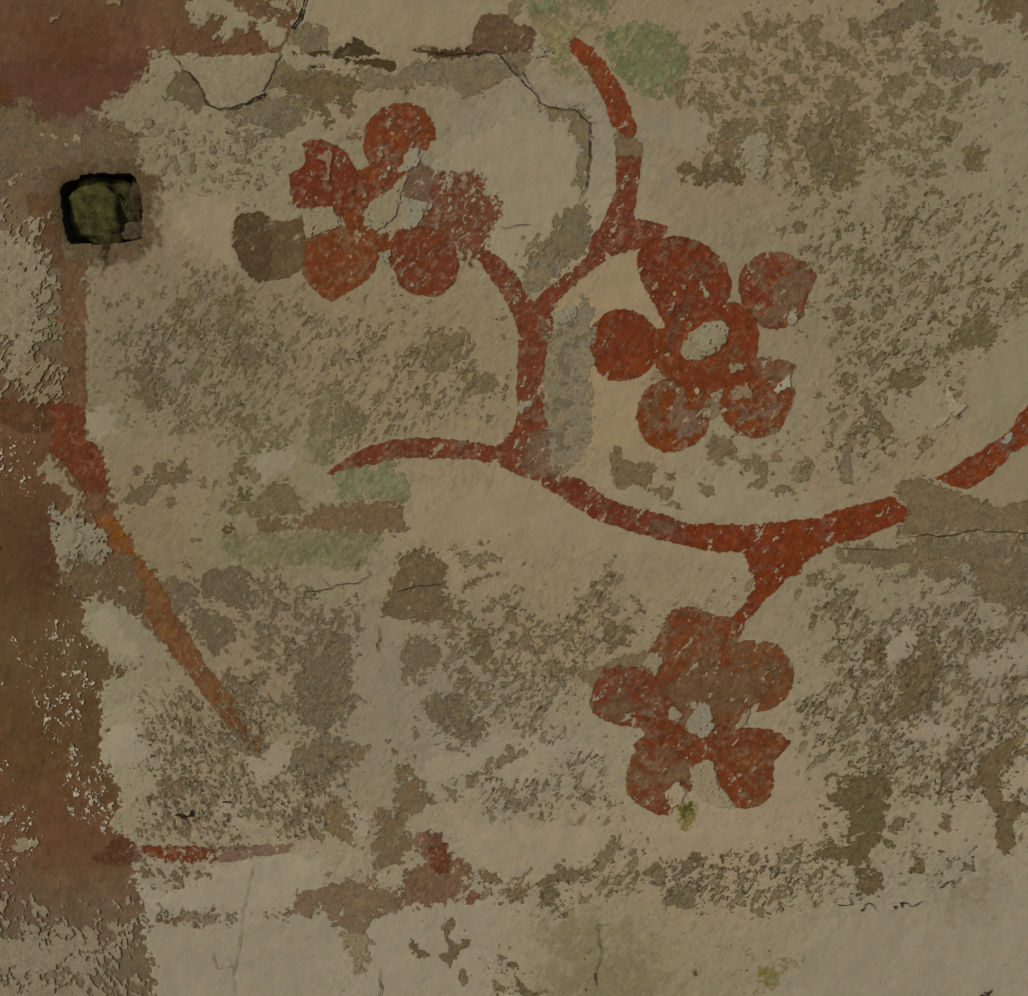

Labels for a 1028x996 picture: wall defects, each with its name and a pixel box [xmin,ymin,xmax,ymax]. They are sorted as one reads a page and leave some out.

crack [157,51,267,110]
peeling [0,0,537,497]
crack [413,50,598,208]
peeling [494,102,595,342]
peeling [661,0,1028,502]
peeling [93,190,598,546]
peeling [47,502,149,617]
crack [844,529,1028,551]
peeling [11,614,121,834]
peeling [126,470,1028,975]
peeling [0,802,155,996]
peeling [409,917,470,986]